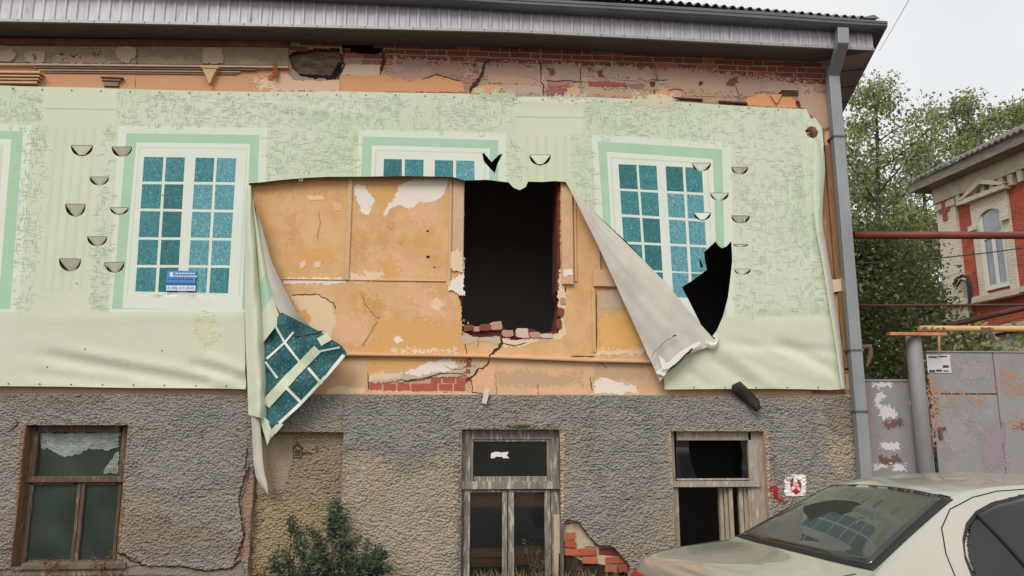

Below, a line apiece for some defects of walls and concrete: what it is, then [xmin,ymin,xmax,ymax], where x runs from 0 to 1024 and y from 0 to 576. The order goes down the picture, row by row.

crack [422,59,491,93]
peeling [251,42,831,145]
peeling [354,178,449,230]
flaking render [325,268,573,394]
crack [398,335,527,395]
peeling [527,378,639,395]
corrosion [925,368,987,447]
crack [117,440,248,572]
flaking render [554,432,630,576]